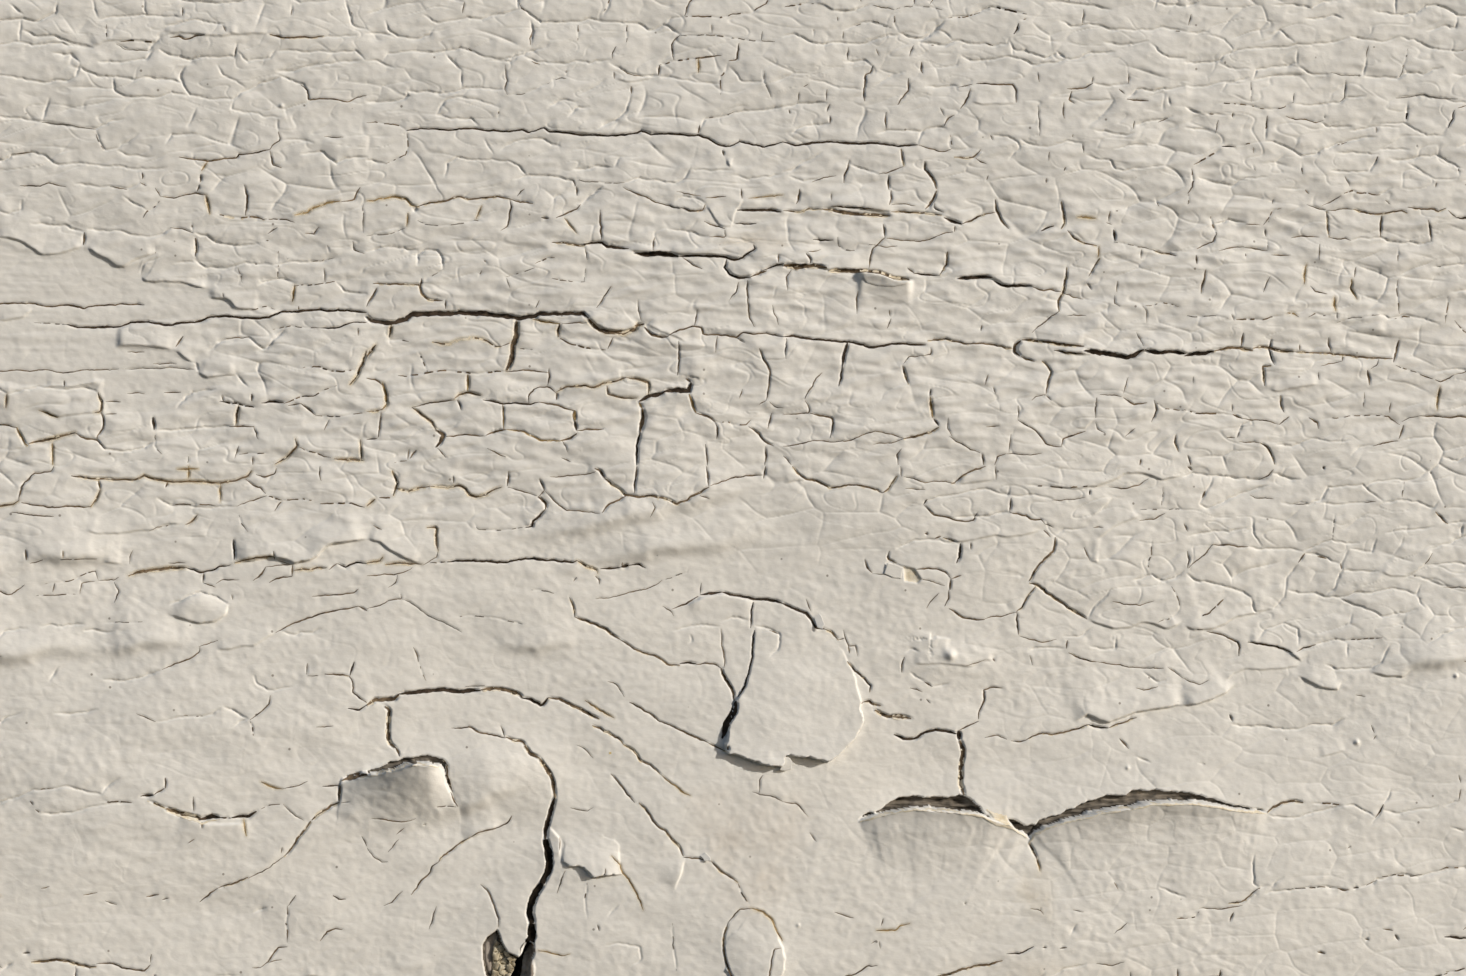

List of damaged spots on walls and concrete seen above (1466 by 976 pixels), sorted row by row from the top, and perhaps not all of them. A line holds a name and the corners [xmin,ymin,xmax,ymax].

crack [612,0,814,94]
crack [837,0,1025,101]
crack [0,45,1466,690]
crack [107,647,691,902]
crack [542,583,1303,870]
crack [384,816,512,928]
crack [455,726,643,976]
crack [611,774,783,976]
crack [0,952,152,976]
crack [255,895,343,968]
peeling [491,940,516,976]
crack [938,908,1131,976]